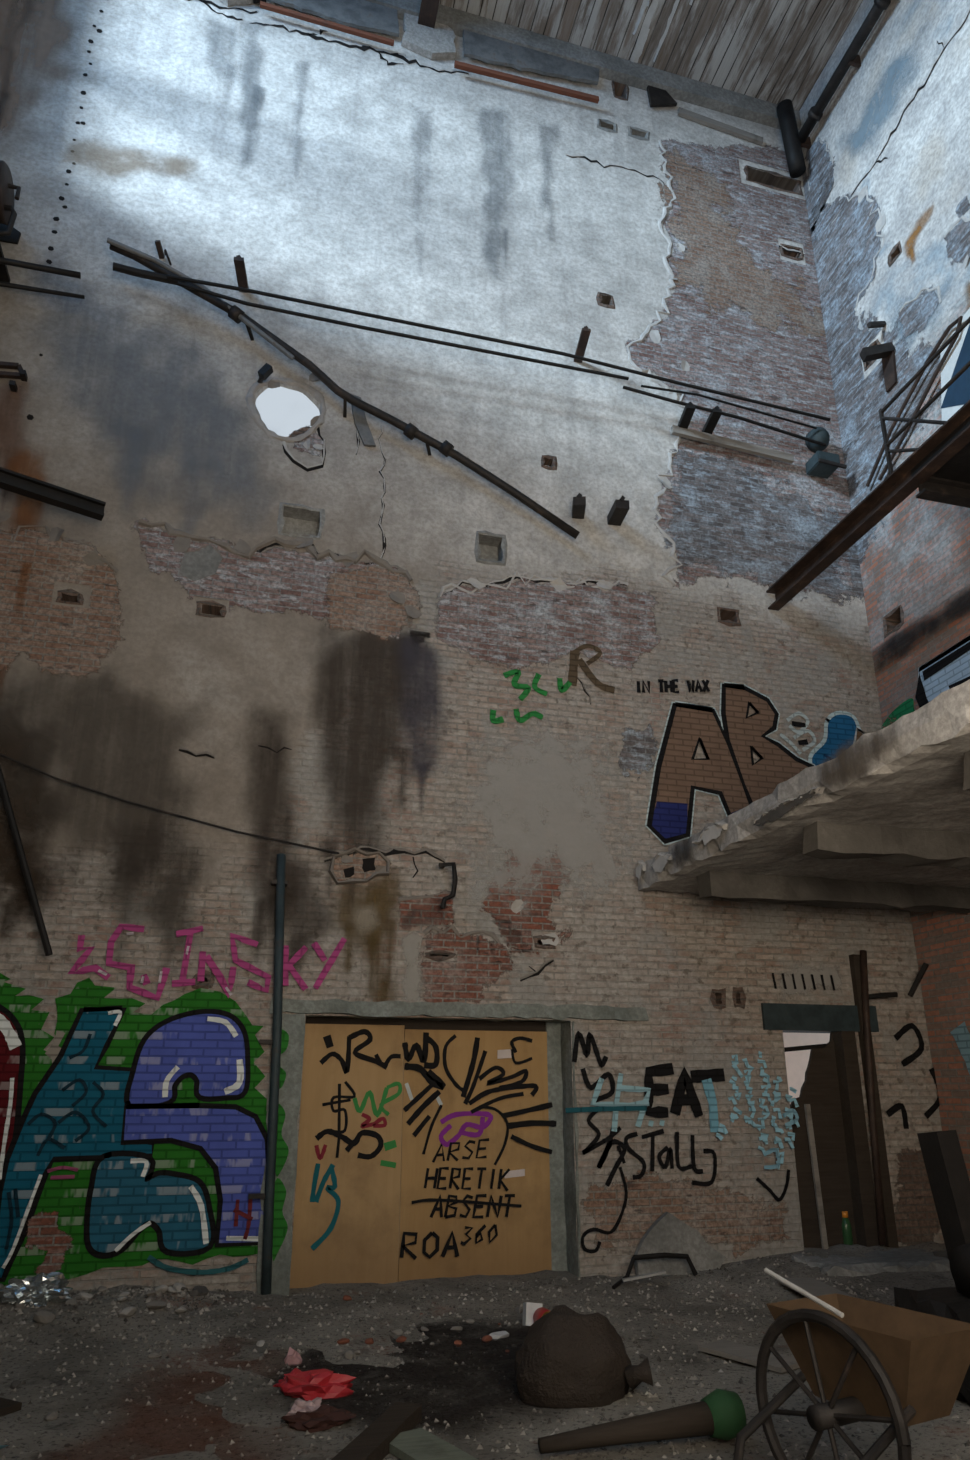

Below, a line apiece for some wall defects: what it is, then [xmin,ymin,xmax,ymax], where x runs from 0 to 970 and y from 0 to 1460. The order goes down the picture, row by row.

crack [831,8,970,224]
crack [738,236,805,254]
spalling [944,196,970,269]
spalling [245,373,327,443]
spalling [596,119,947,589]
spalling [133,502,660,671]
spalling [791,520,884,606]
water stain [0,679,193,937]
water stain [254,724,322,940]
water stain [318,632,437,857]
water stain [340,877,395,1002]
spalling [399,849,573,1004]